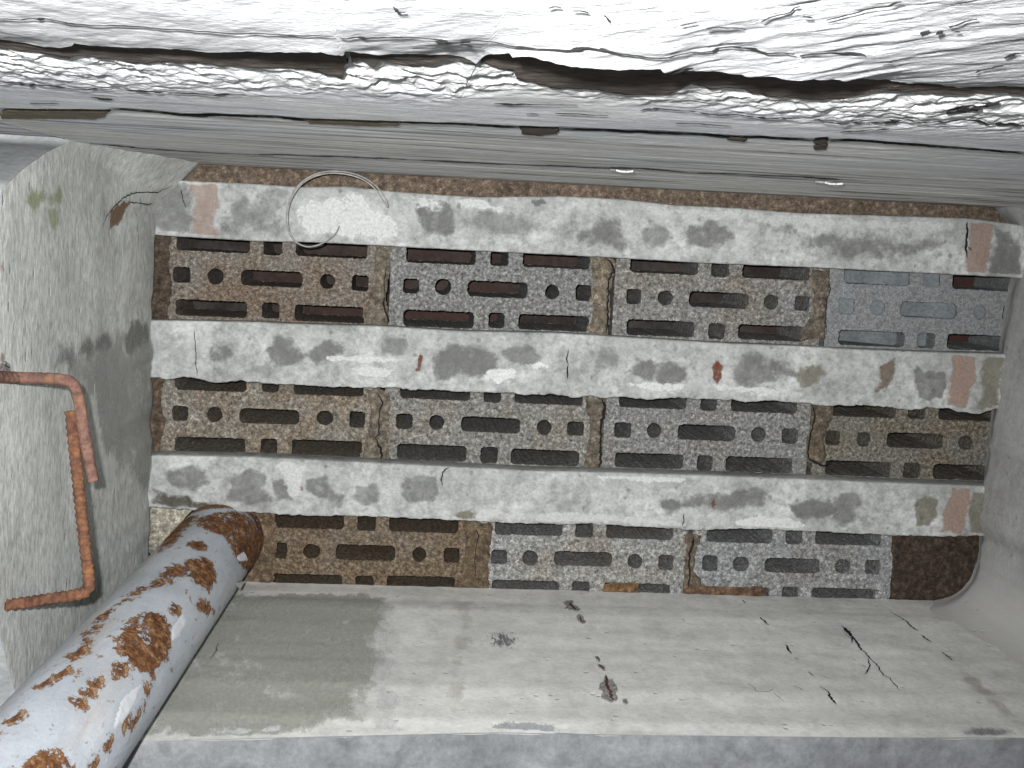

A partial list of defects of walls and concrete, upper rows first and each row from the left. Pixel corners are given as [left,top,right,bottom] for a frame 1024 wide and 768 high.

peeling [0,0,1024,186]
crack [375,395,383,459]
crack [807,404,830,467]
crack [682,514,695,588]
leakage [145,593,391,736]
crack [749,644,836,704]
crack [842,626,898,688]